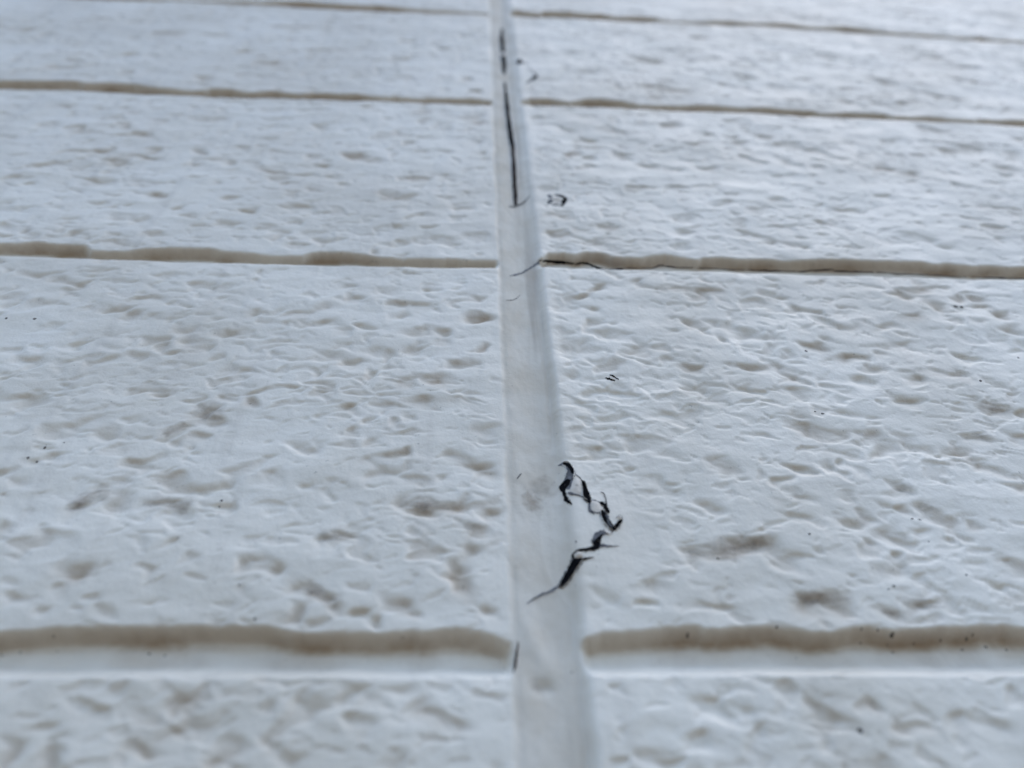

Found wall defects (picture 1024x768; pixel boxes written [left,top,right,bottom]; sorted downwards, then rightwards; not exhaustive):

crack [511,260,1024,279]
crack [526,461,623,604]